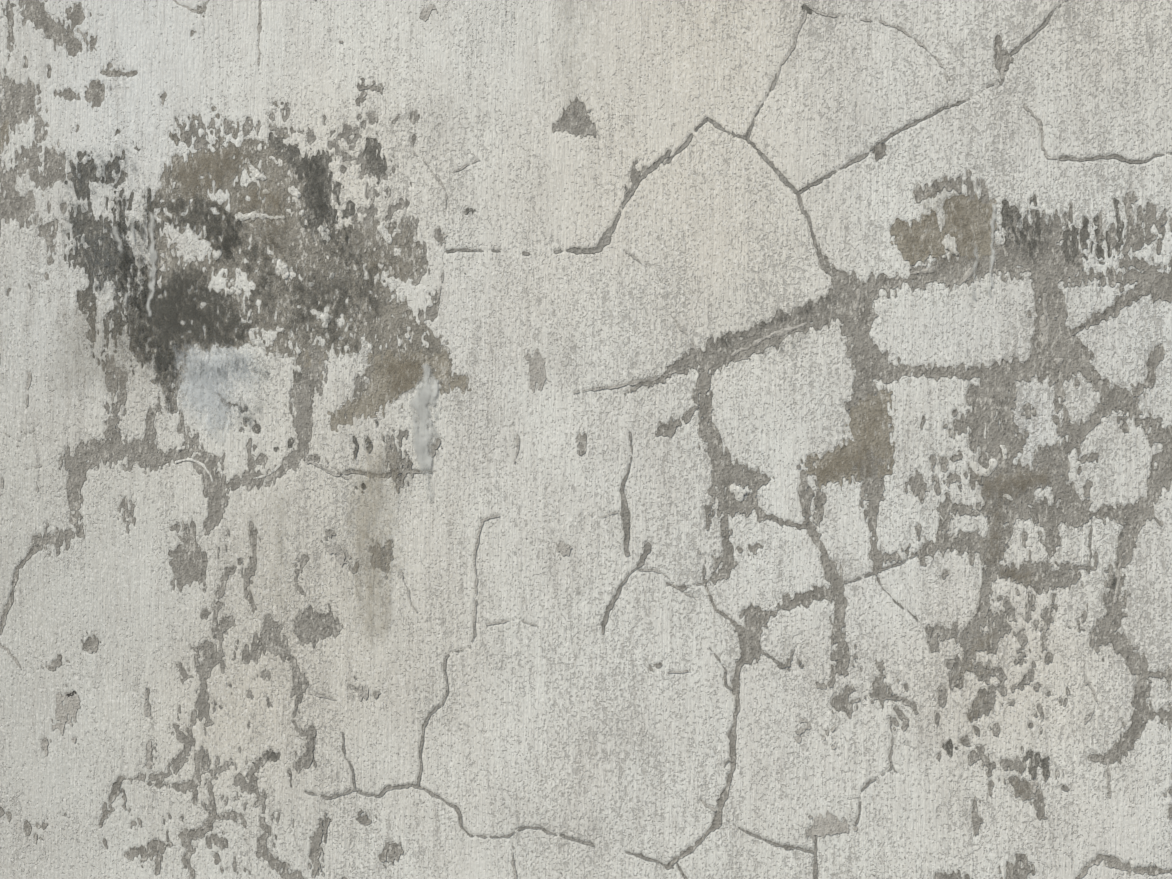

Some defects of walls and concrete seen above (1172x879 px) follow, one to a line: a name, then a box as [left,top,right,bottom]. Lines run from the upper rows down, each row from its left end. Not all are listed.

crack [409,0,1067,394]
damp [988,192,1172,294]
crack [1023,105,1172,164]
crack [3,372,35,441]
peeling [0,0,471,879]
crack [0,522,75,669]
crack [590,431,696,634]
crack [304,515,594,879]
crack [625,604,858,879]
crack [1084,681,1098,724]
crack [1104,759,1112,798]
crack [1145,666,1172,691]